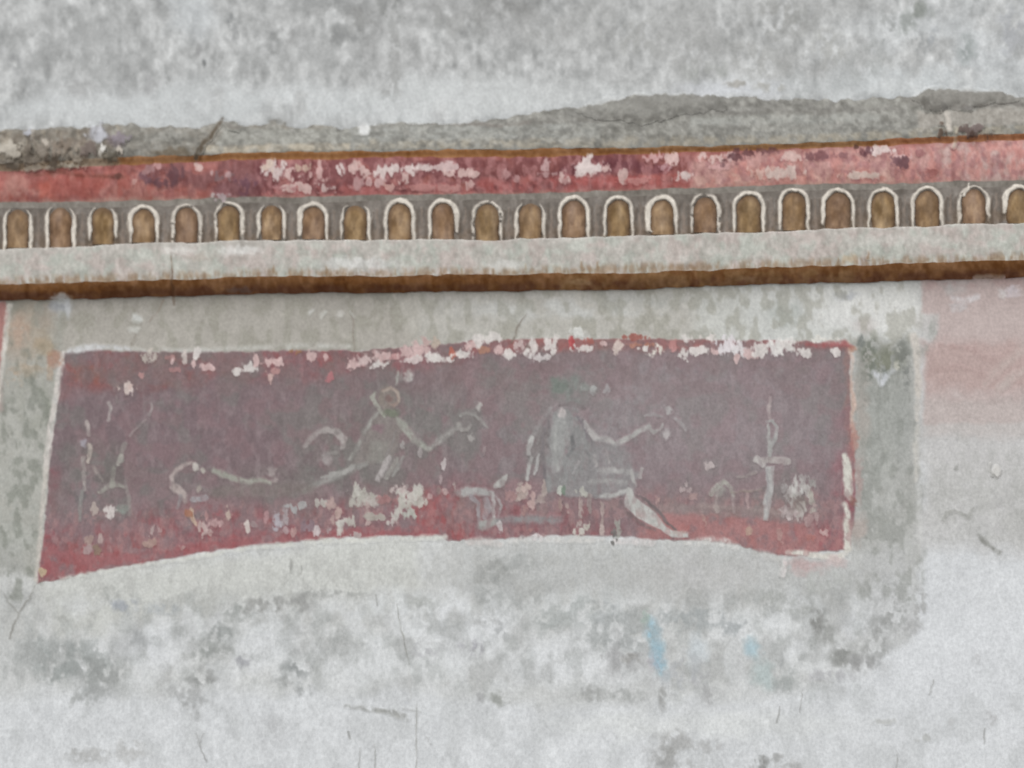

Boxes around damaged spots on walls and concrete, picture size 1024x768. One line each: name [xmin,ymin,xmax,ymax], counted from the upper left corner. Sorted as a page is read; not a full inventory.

spalling [0,119,133,173]
spalling [356,121,371,137]
peeling [258,155,481,196]
peeling [536,150,733,188]
peeling [745,149,809,183]
peeling [836,143,914,181]
spalling [919,103,995,150]
peeling [230,325,848,386]
peeling [184,456,457,540]
peeling [504,478,623,547]